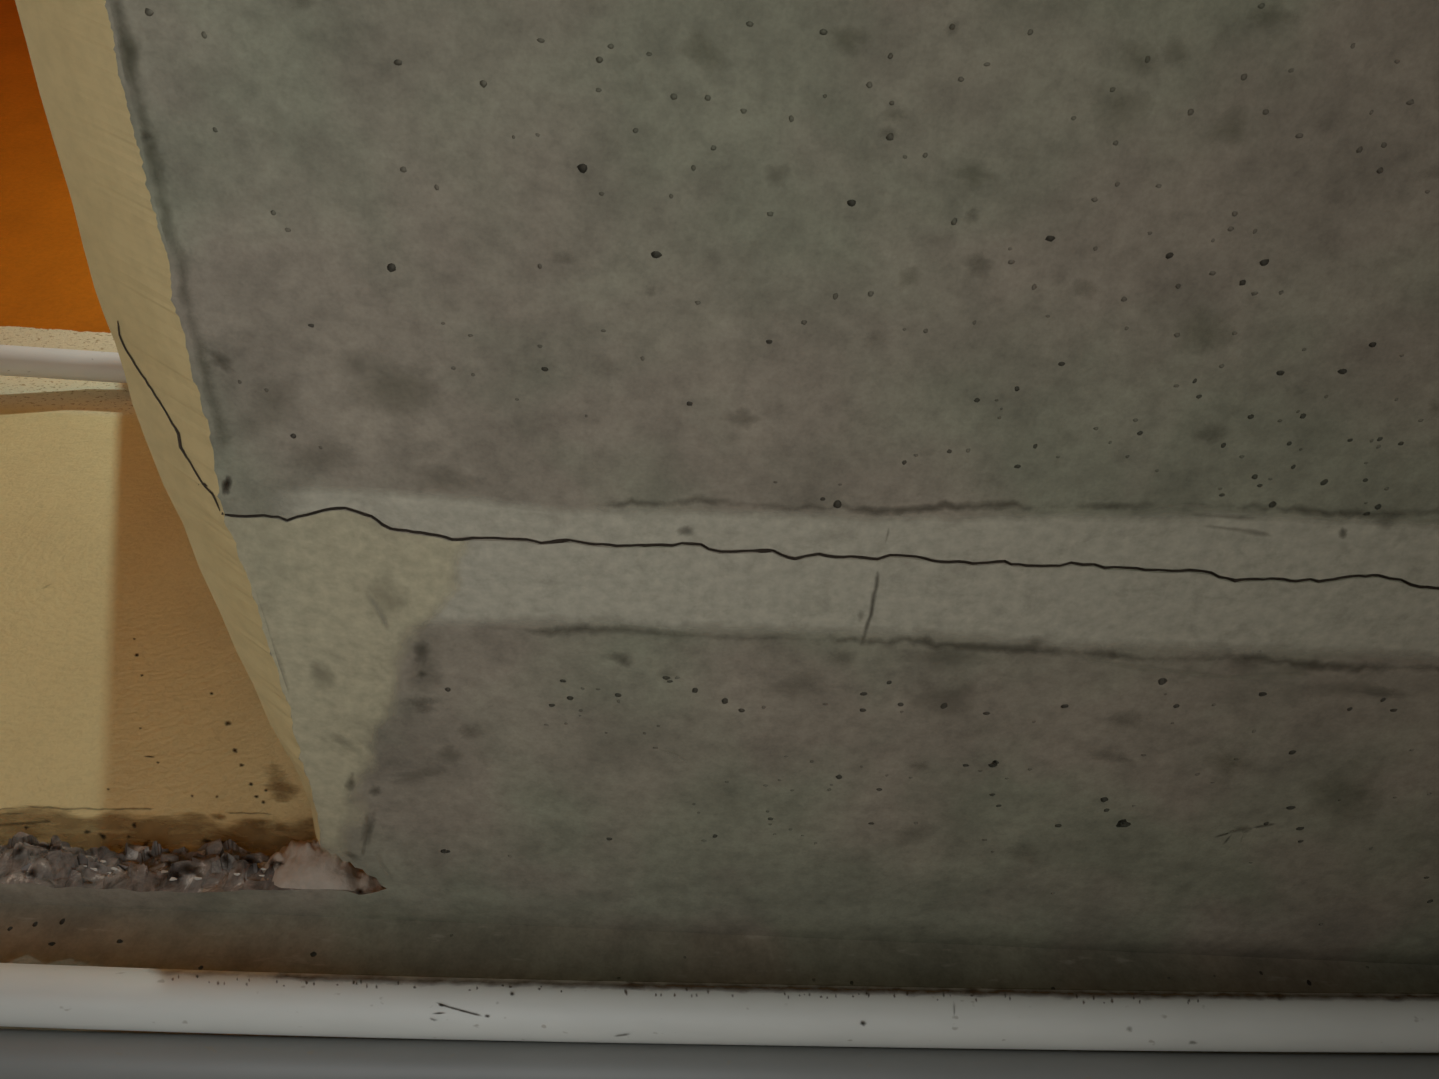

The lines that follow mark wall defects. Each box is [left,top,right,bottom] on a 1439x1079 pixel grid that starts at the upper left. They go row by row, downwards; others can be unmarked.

crack [117,321,1439,627]
spalling [0,832,387,895]